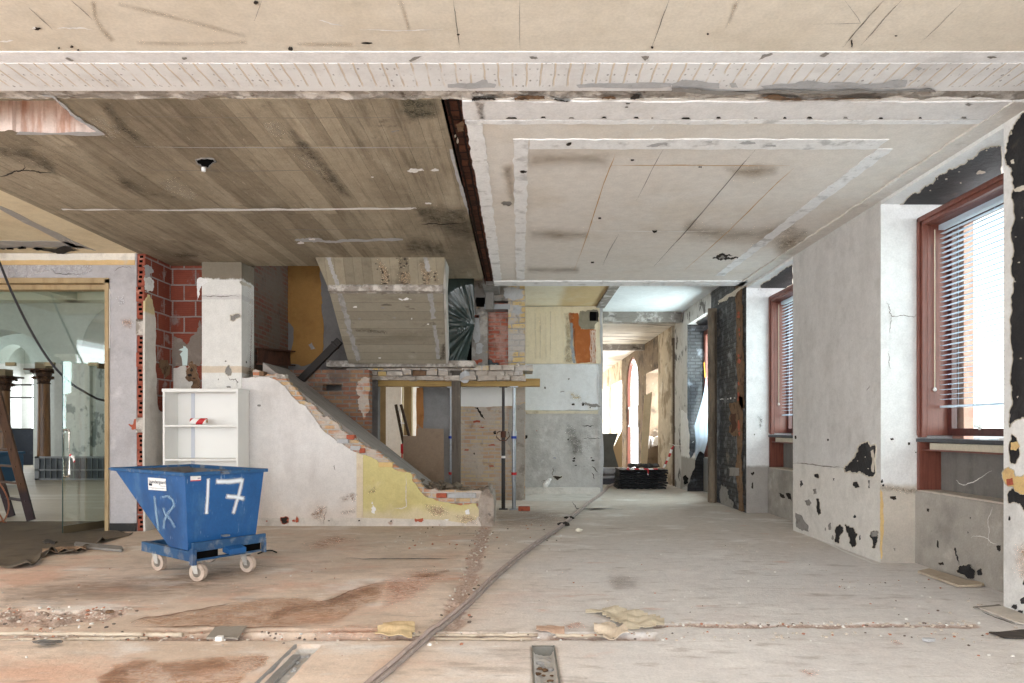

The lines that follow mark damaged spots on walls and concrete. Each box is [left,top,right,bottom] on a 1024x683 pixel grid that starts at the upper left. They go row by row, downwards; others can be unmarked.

crack [0,165,52,177]
flaking render [900,112,1024,511]
flaking render [159,346,201,389]
flaking render [779,441,896,559]
flaking render [954,548,982,579]